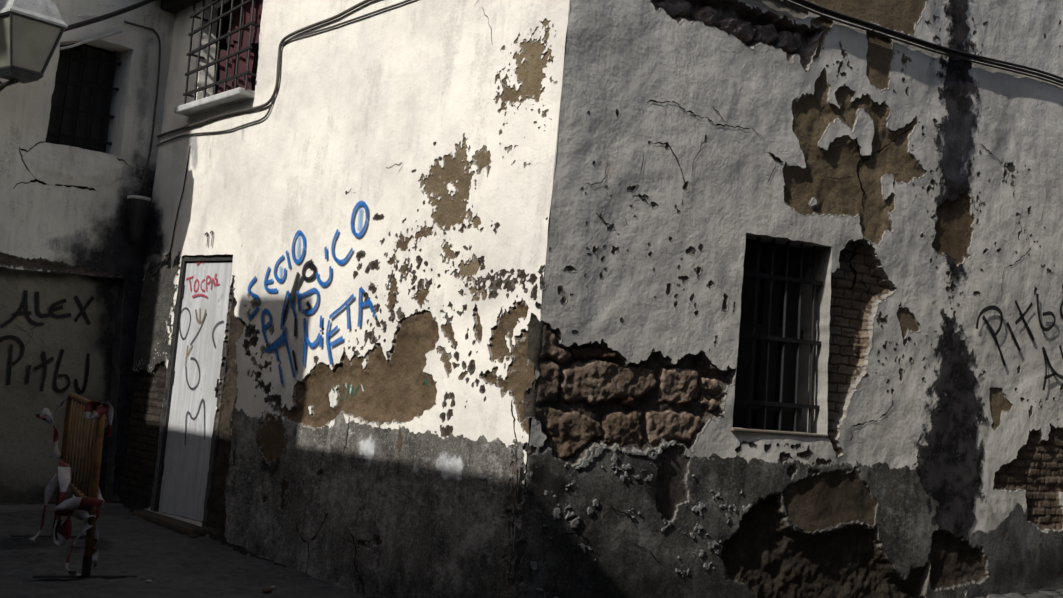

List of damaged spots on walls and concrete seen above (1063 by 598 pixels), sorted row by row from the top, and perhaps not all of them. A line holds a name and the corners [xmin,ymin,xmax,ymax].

crack [596,100,784,231]
damp [931,0,980,218]
spalling [0,252,123,278]
spalling [202,0,1046,598]
damp [936,253,969,294]
damp [912,301,988,548]
spalling [978,365,1063,531]